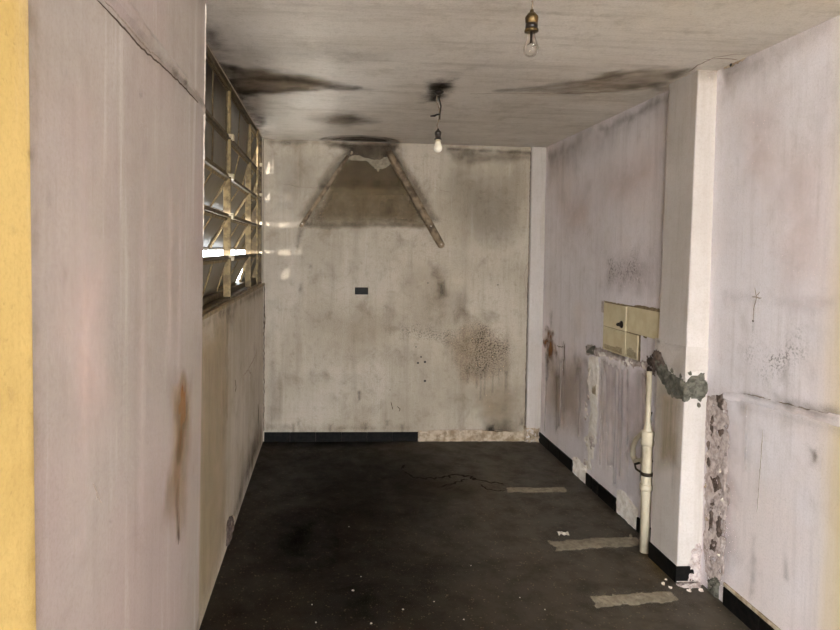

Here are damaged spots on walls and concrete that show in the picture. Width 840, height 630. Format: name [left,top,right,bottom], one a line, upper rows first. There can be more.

water stain [228,66,335,94]
corrosion [543,332,557,360]
corrosion [177,380,187,462]
flaking render [418,429,524,442]
peeling [572,338,708,483]
crack [401,465,505,491]
flaking render [616,490,638,530]
flaking render [661,394,730,599]